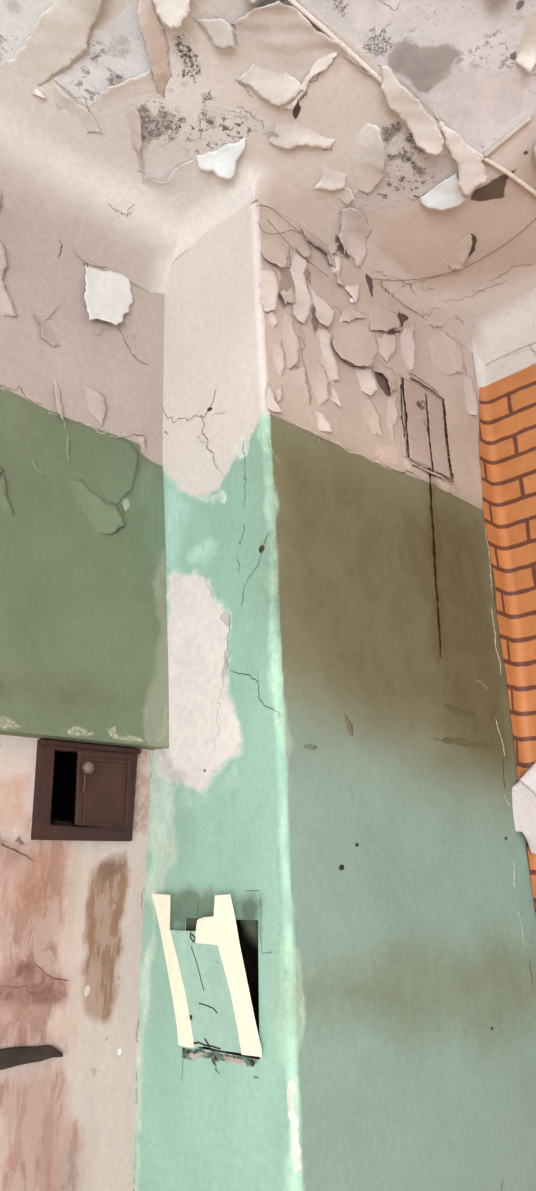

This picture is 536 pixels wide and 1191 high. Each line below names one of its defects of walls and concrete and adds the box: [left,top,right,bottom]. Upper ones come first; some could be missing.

peeling [0,0,282,195]
peeling [0,241,17,317]
peeling [82,260,134,325]
peeling [259,0,536,442]
crack [162,391,501,672]
peeling [155,573,241,791]
crack [229,671,280,716]
crack [495,718,509,805]